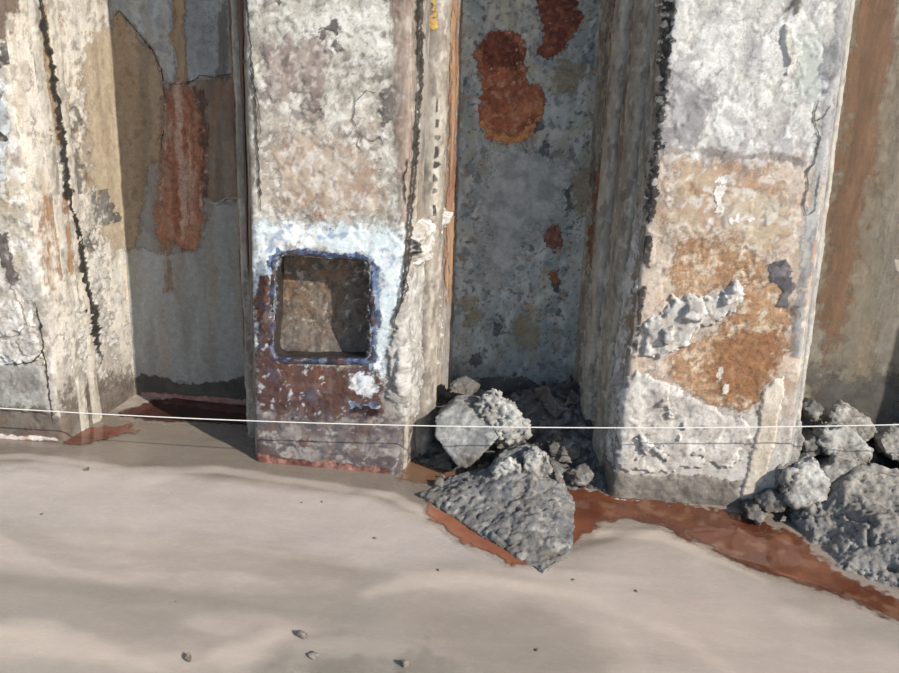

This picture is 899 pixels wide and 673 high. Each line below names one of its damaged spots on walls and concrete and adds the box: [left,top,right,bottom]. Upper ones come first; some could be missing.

peeling [0,39,34,181]
crack [116,0,262,211]
rust [140,0,385,422]
crack [394,0,425,323]
rust [472,0,584,145]
crack [802,101,831,216]
rust [815,0,898,363]
crack [4,302,53,422]
damp [262,247,382,371]
peeling [660,322,677,347]
rust [664,235,793,412]
peeling [720,283,743,305]